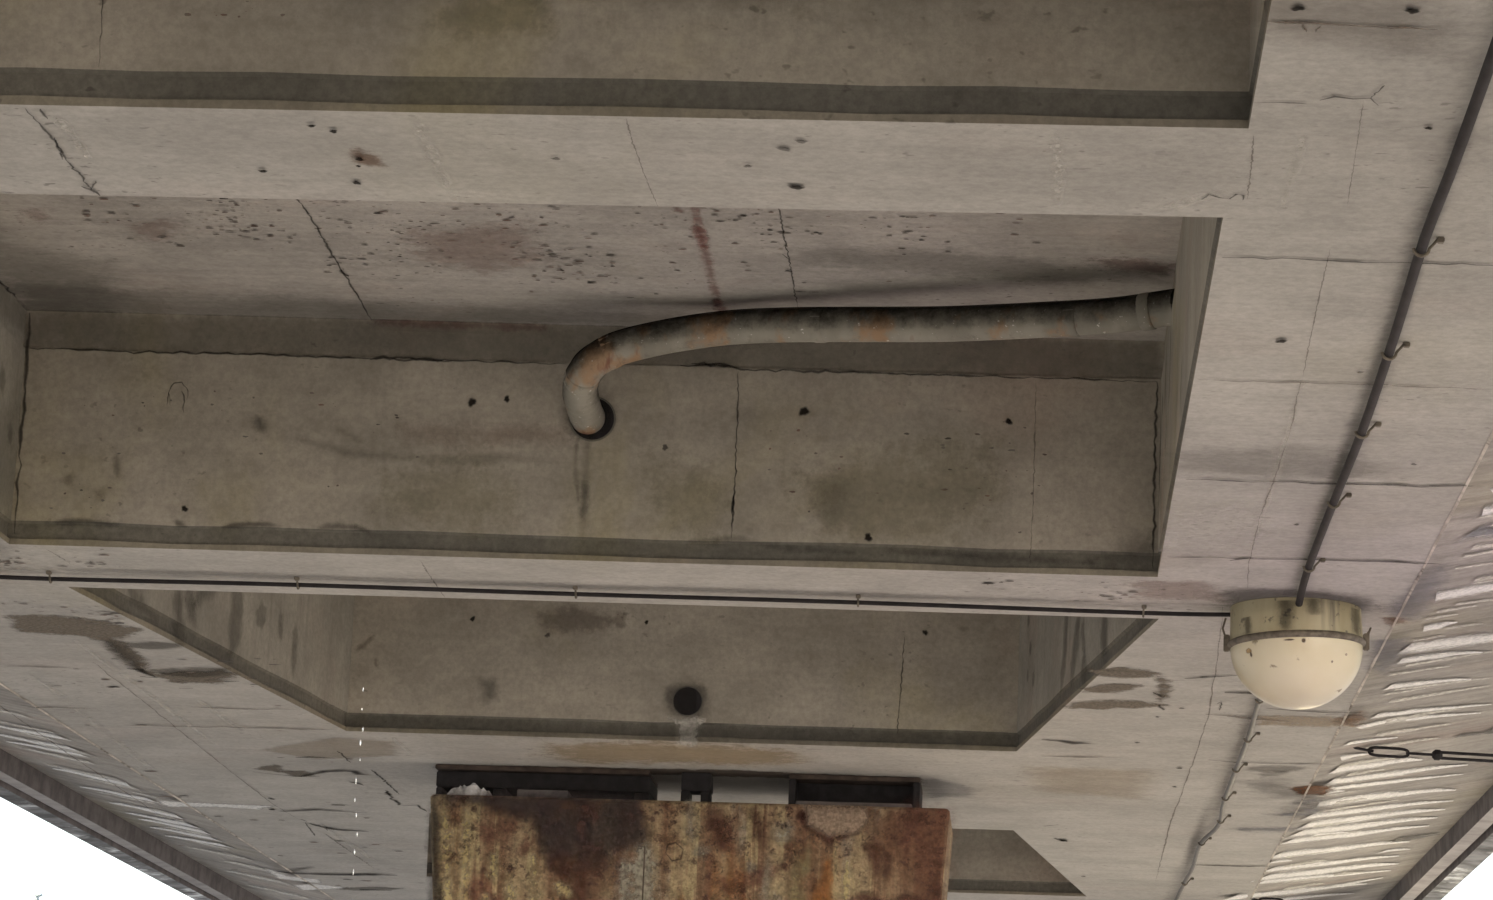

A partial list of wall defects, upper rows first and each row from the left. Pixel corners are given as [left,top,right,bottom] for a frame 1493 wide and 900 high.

crack [25,108,100,196]
crack [296,199,368,315]
crack [779,210,798,307]
crack [0,282,562,534]
corrosion [429,790,941,900]